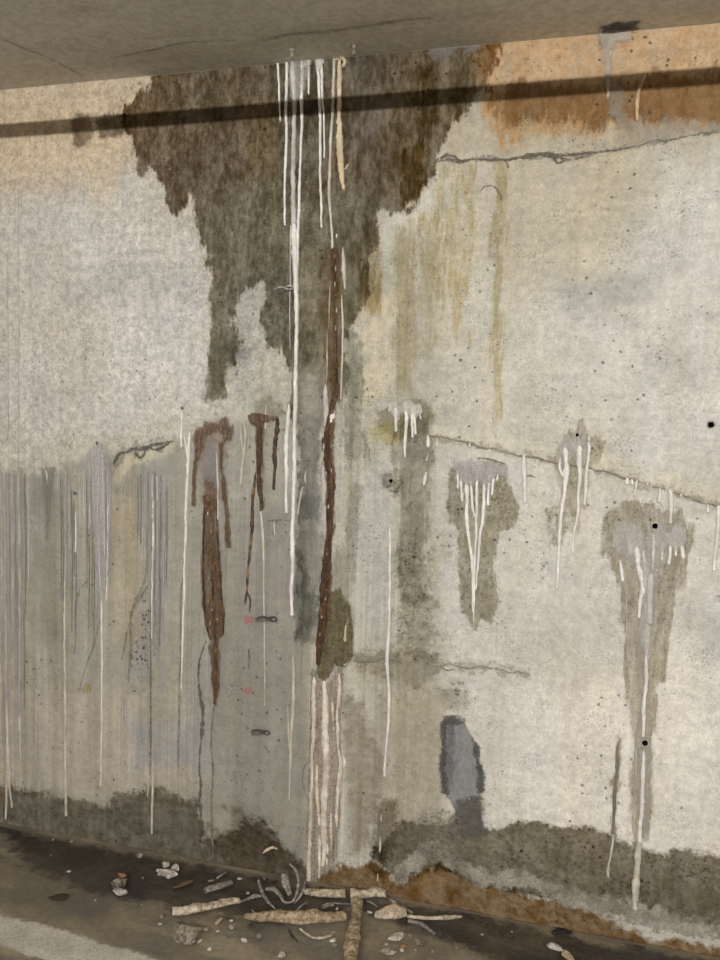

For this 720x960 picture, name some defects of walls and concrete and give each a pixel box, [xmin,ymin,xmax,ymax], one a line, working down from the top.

crack [436,130,718,201]
water stain [96,43,508,622]
water stain [42,442,111,835]
rust [192,417,233,705]
rust [244,413,280,612]
water stain [228,655,346,882]
rust [316,247,339,666]
spalling [439,715,486,841]
water stain [373,476,720,939]
water stain [556,436,591,590]
crack [430,435,718,506]
rust [316,862,646,944]